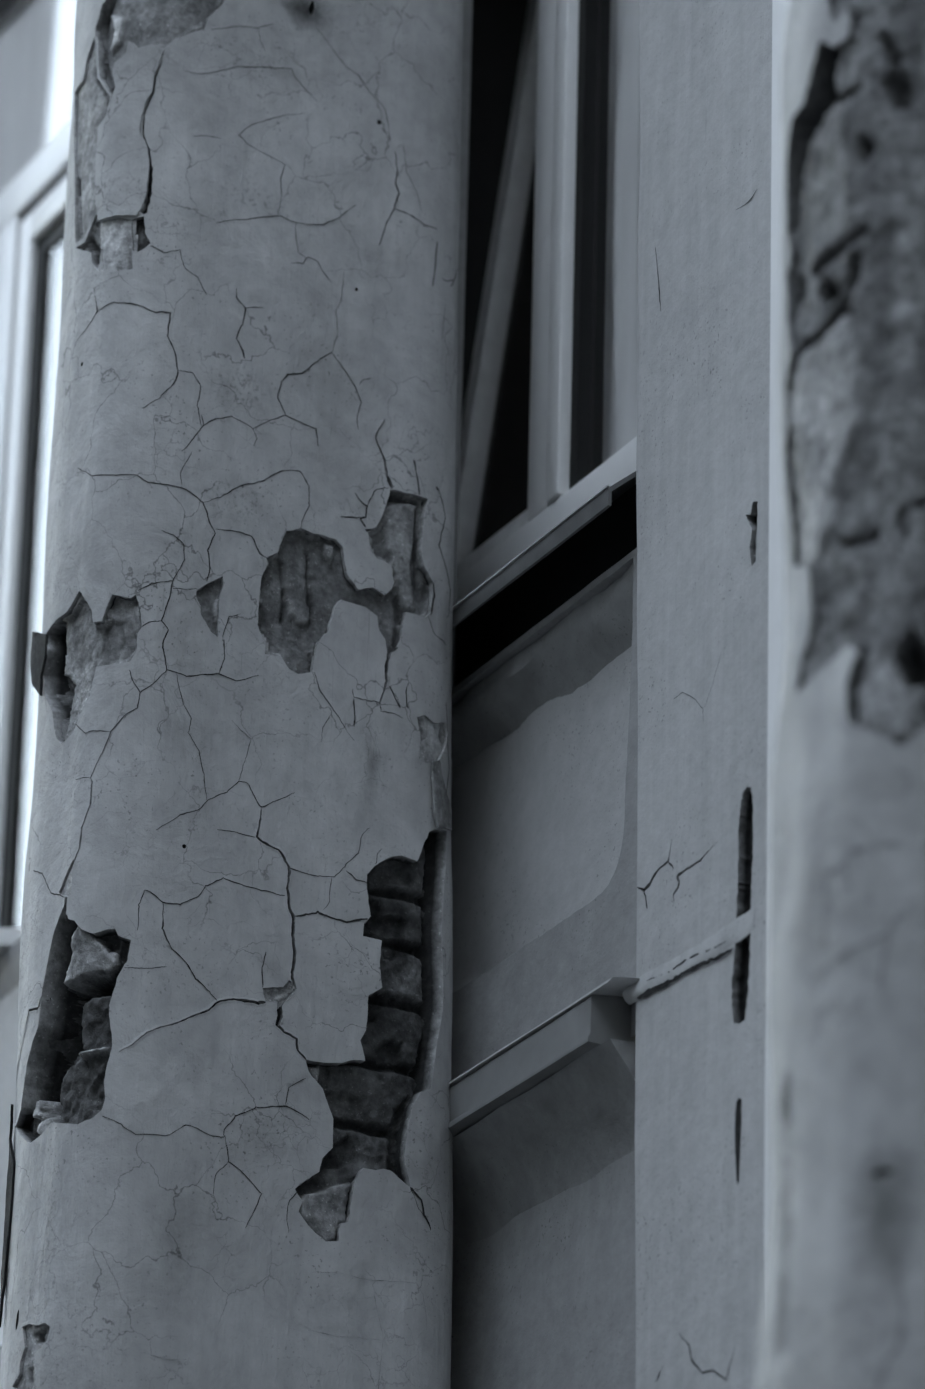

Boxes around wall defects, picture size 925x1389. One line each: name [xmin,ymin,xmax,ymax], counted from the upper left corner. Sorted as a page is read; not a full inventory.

flaking render [74,0,225,271]
spalling [785,0,925,747]
spalling [30,591,142,745]
crack [34,24,457,1233]
spalling [257,490,433,674]
spalling [746,501,758,566]
crack [13,996,51,1157]
spalling [0,859,131,1328]
spalling [295,715,452,1241]
crack [636,787,753,1024]
spalling [12,1323,50,1389]
crack [655,1335,735,1382]